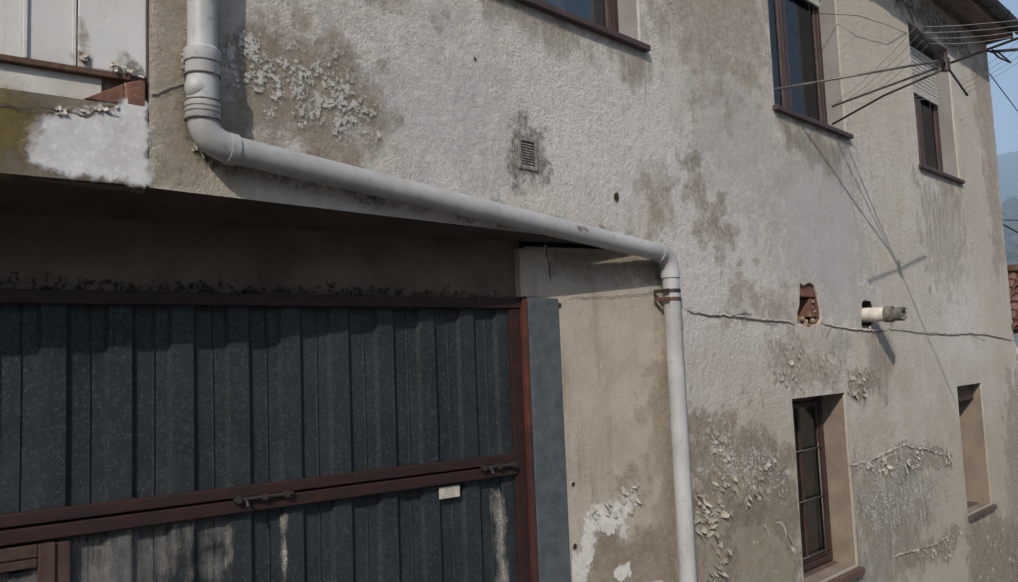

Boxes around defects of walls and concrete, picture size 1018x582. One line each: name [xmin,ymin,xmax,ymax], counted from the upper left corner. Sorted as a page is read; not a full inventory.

water stain [220,21,385,166]
water stain [0,272,510,298]
crack [686,307,795,326]
spalling [797,283,820,327]
crack [821,321,1013,340]
peeling [860,444,955,478]
peeling [688,413,795,582]
peeling [571,463,677,582]
water stain [62,518,233,582]